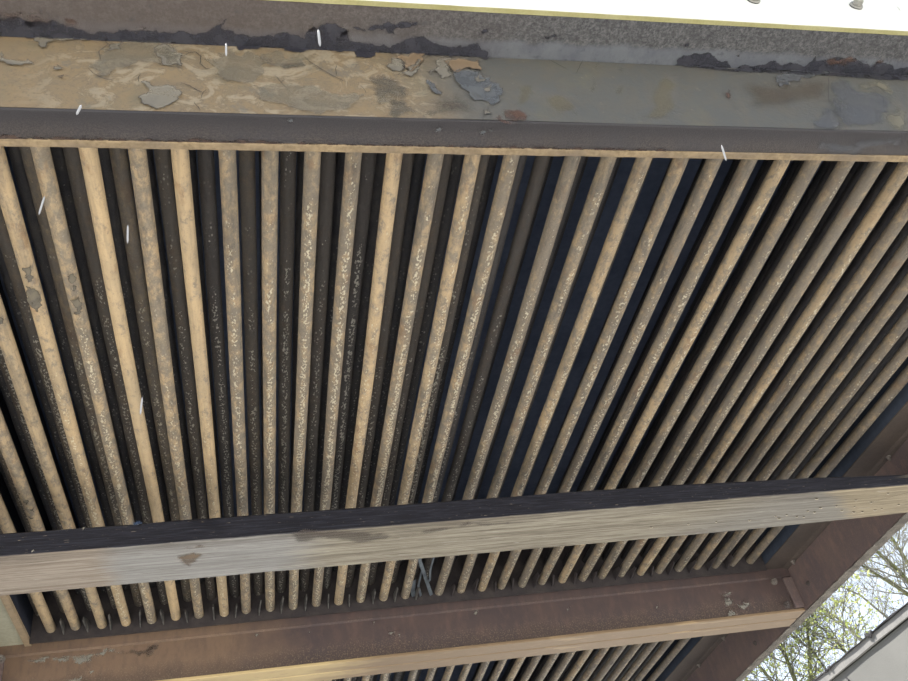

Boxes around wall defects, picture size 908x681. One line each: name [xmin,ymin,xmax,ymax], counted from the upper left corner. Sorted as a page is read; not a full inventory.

peeling [387,53,482,94]